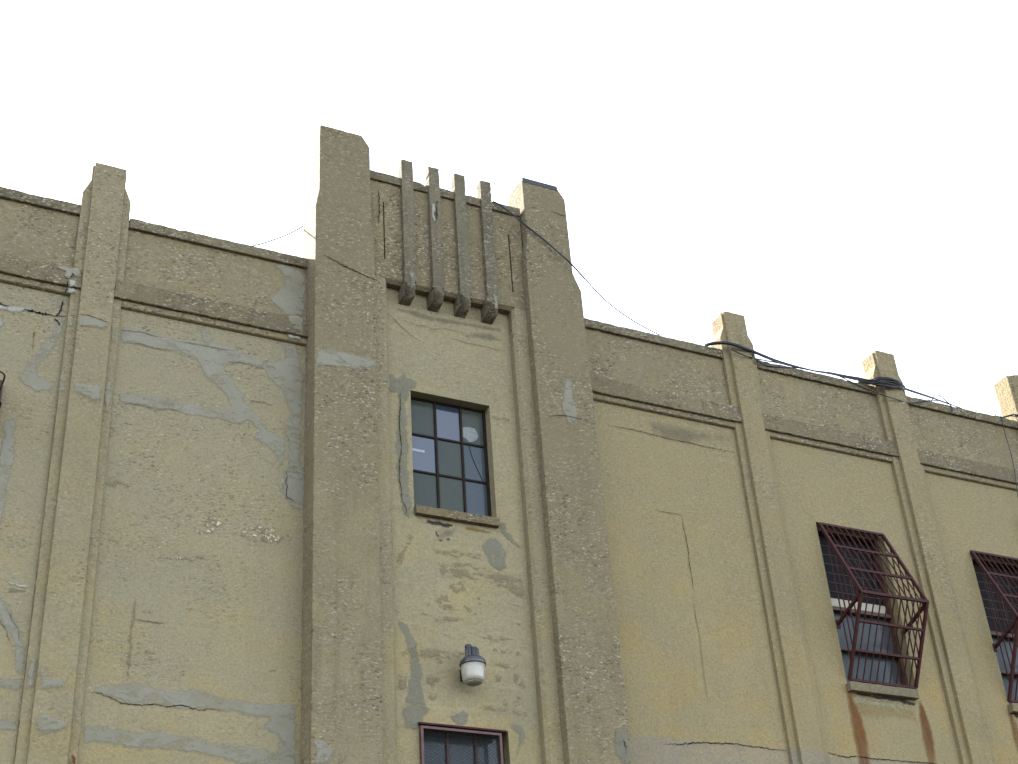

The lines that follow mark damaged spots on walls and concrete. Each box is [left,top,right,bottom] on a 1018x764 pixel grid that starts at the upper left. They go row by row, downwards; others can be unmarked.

crack [0,273,260,368]
crack [127,598,164,676]
crack [96,692,220,711]
crack [666,742,787,751]
rust [848,694,869,764]
crack [829,752,936,764]
rust [920,705,934,755]